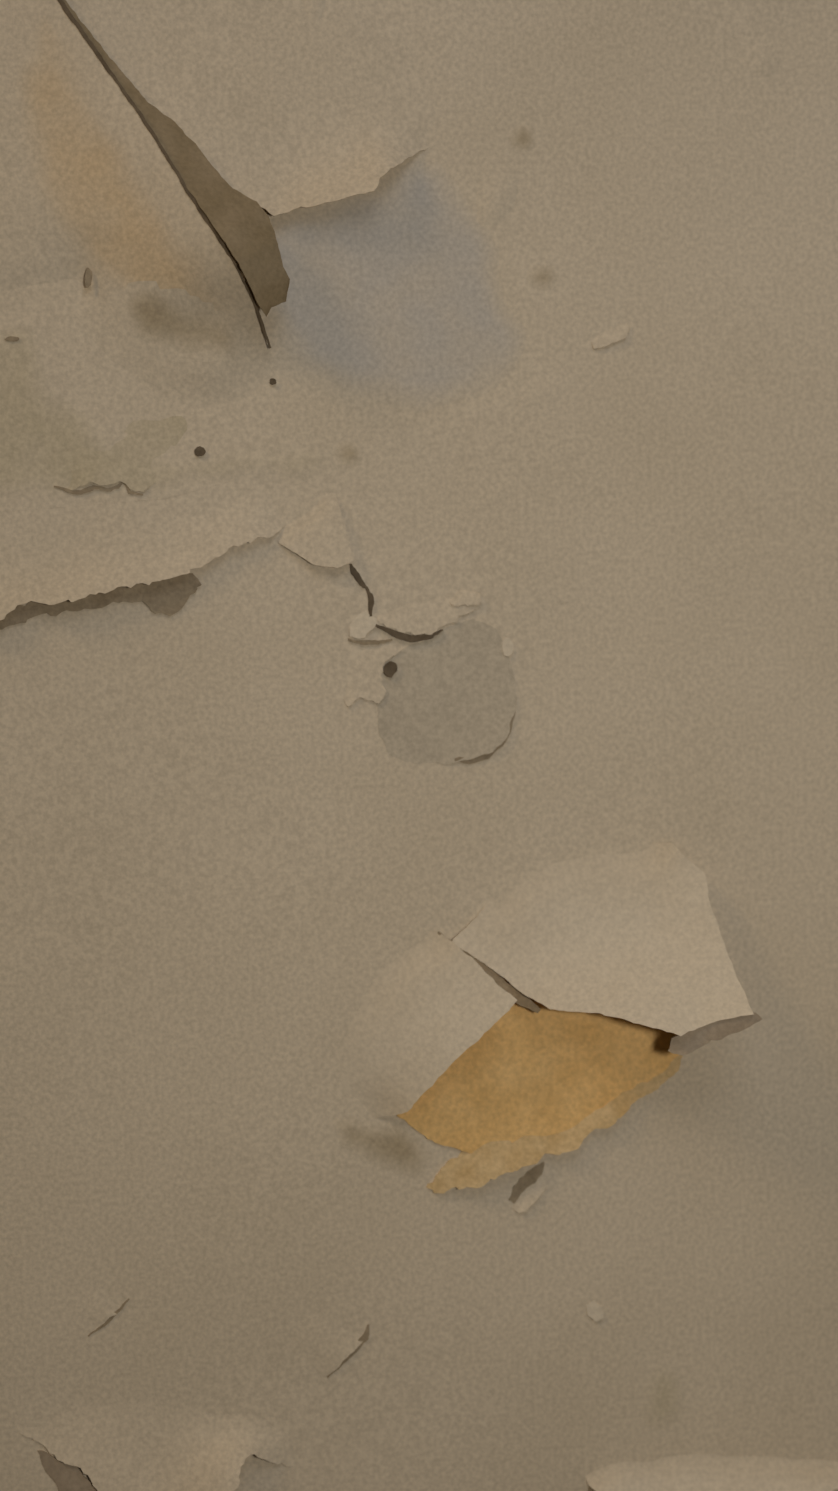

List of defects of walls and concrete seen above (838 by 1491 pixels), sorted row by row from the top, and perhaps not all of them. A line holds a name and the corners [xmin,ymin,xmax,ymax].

peeling [0,0,527,496]
peeling [0,491,355,630]
peeling [342,590,517,765]
peeling [339,843,762,1213]
peeling [18,1398,296,1491]
peeling [585,1454,838,1491]